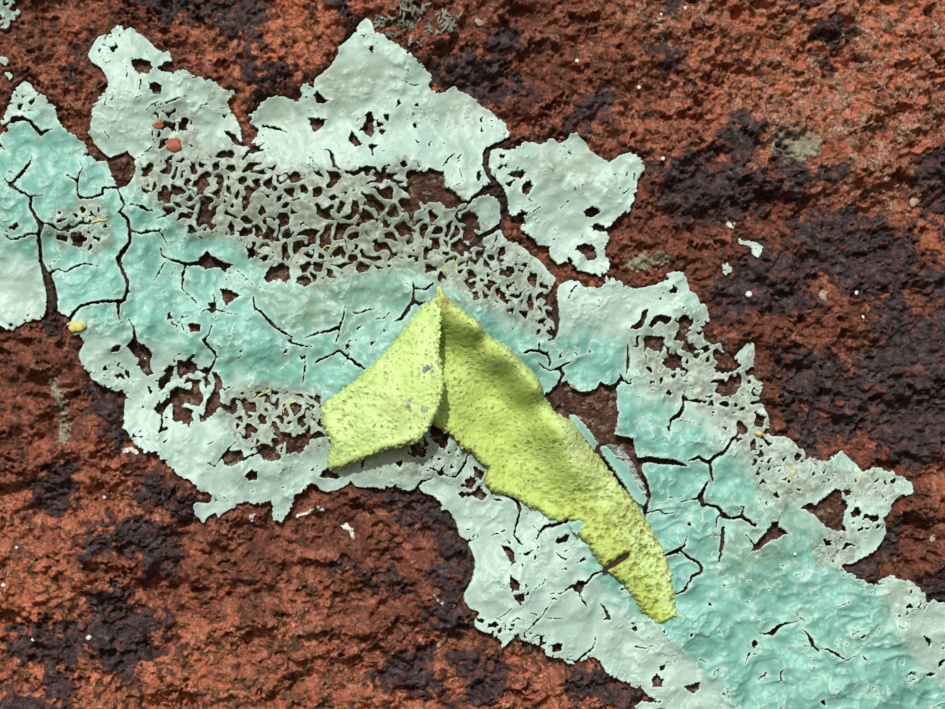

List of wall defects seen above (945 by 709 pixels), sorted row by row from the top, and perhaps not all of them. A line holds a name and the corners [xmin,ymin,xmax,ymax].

crack [11,117,52,136]
crack [328,150,397,180]
crack [443,138,568,256]
peeling [489,132,645,277]
peeling [71,232,87,247]
crack [5,160,434,383]
crack [523,285,576,385]
peeling [173,406,194,427]
peeling [187,387,203,406]
crack [667,395,705,431]
crack [465,495,568,556]
crack [632,432,777,594]